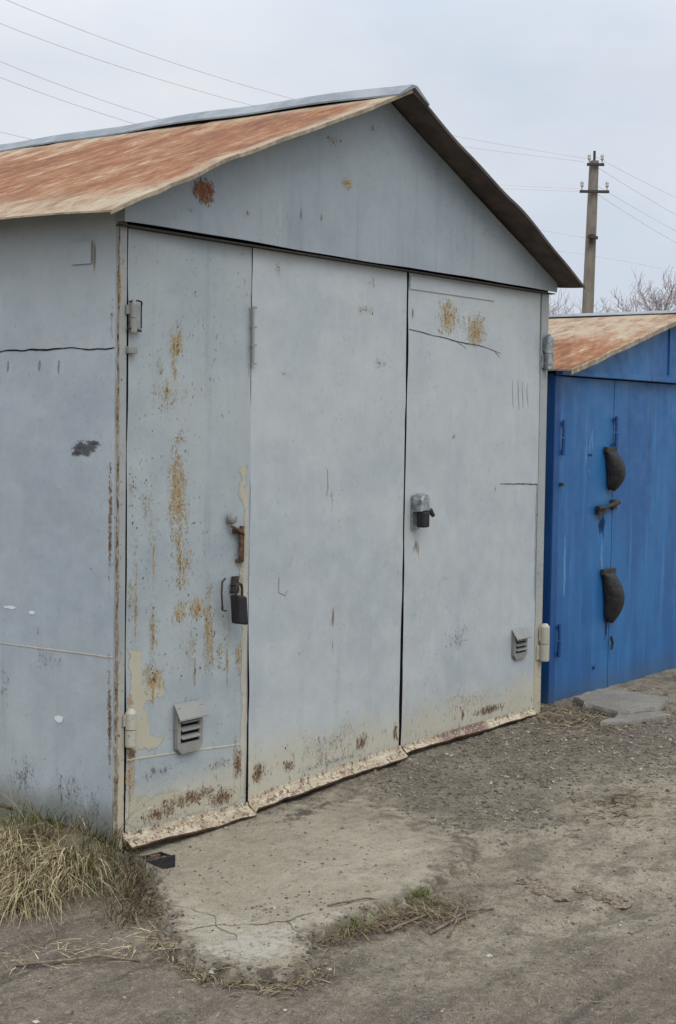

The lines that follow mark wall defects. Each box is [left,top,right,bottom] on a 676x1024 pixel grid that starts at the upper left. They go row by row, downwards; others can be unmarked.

rust [192,177,215,206]
crack [0,347,115,373]
rust [153,324,188,418]
crack [410,329,499,356]
rust [438,299,487,345]
damp [72,440,99,456]
rust [108,426,242,705]
peeling [129,649,165,752]
rust [443,696,505,722]
rust [312,724,368,765]
rust [134,741,264,825]